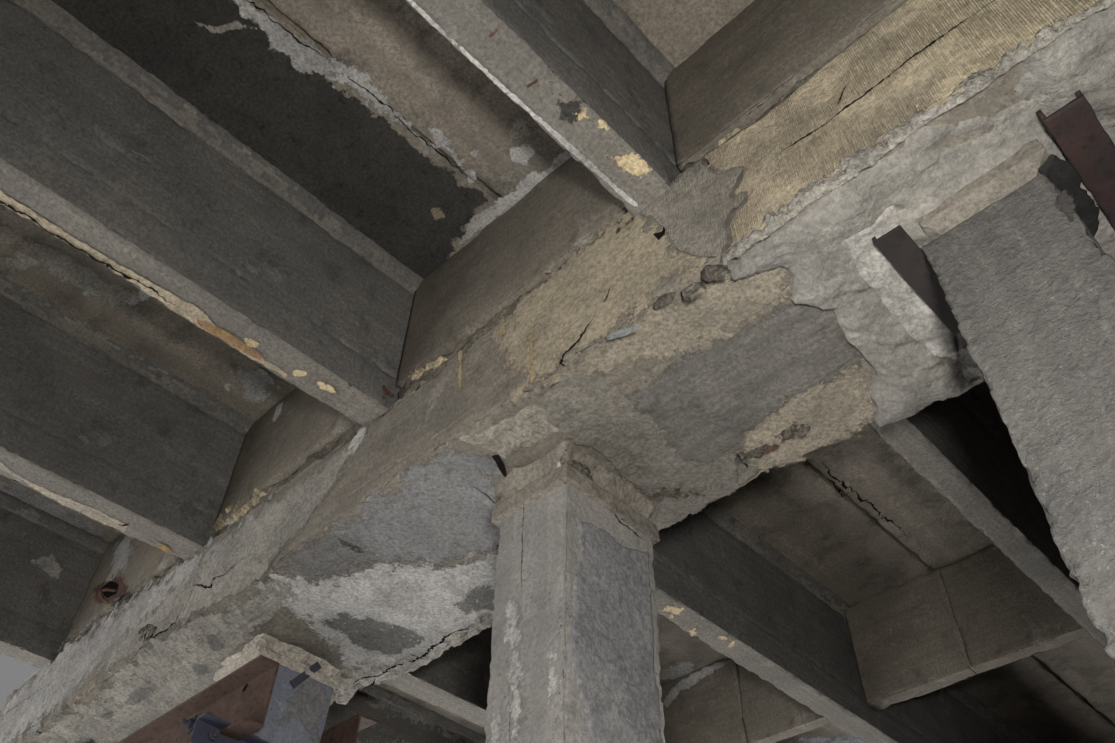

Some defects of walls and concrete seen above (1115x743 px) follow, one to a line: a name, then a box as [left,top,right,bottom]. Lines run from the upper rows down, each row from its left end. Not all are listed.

peeling [408,0,1115,309]
peeling [0,190,287,378]
crack [559,289,610,367]
spalling [475,454,507,477]
crack [822,461,907,536]
corrosion [93,535,138,607]
peeling [0,427,367,743]
spalling [334,613,492,705]